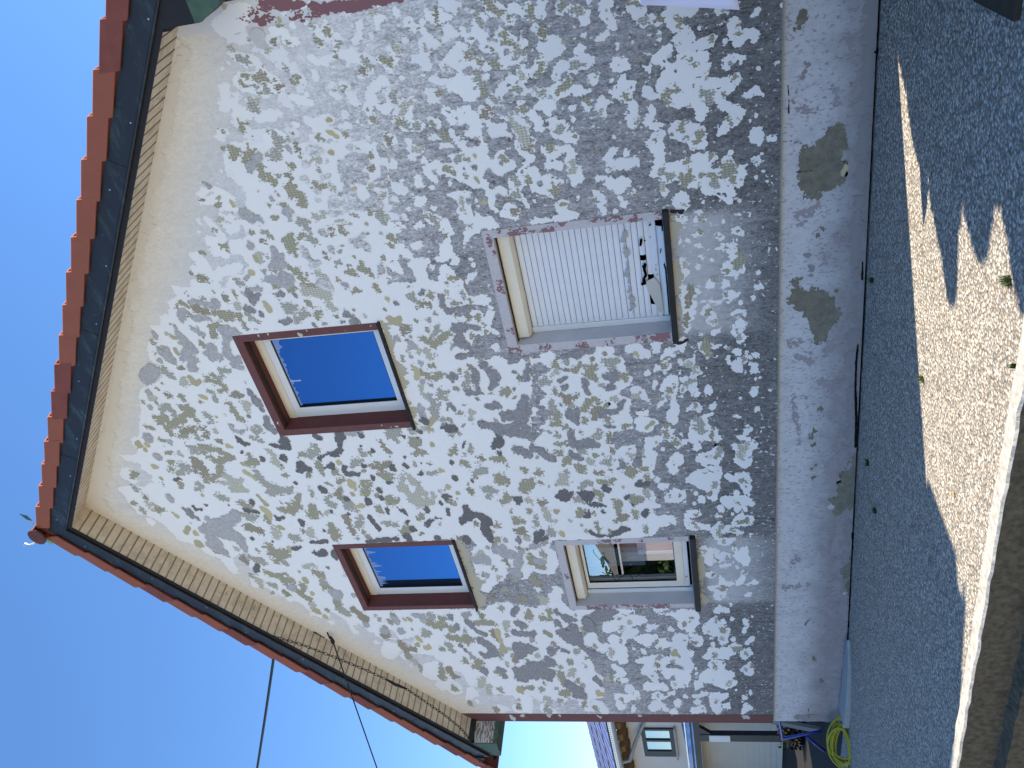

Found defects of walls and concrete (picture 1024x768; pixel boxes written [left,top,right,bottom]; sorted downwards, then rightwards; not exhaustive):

spalling [793,8,808,32]
spalling [796,123,849,201]
spalling [786,277,842,345]
peeling [117,0,777,721]